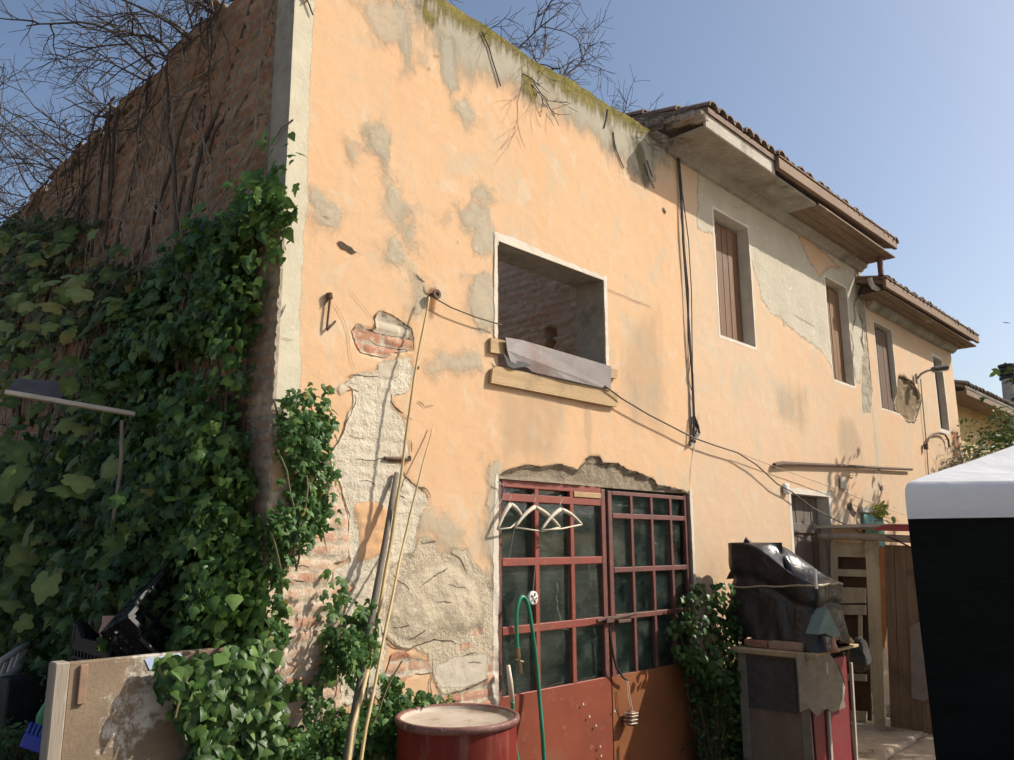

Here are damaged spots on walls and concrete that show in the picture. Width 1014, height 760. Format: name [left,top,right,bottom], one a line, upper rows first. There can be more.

water stain [394,0,668,186]
peeling [384,177,415,266]
peeling [461,187,495,255]
peeling [469,271,498,333]
spalling [851,270,873,413]
peeling [266,310,503,732]